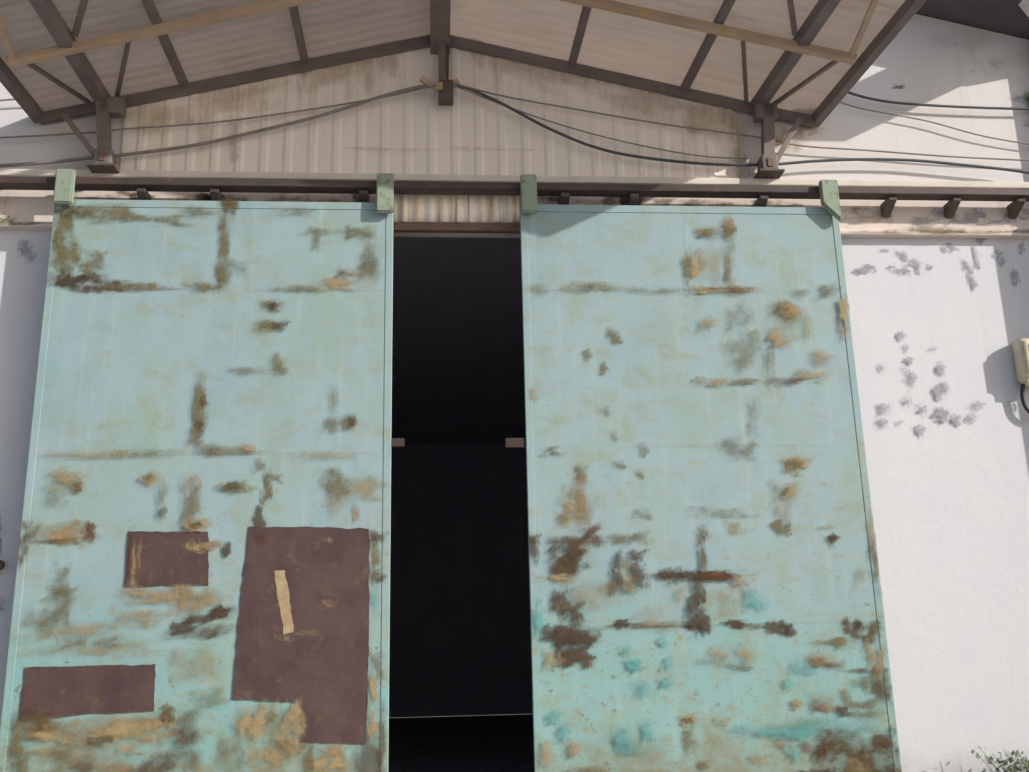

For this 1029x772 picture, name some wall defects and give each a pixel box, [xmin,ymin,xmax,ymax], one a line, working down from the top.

corrosion [51,191,182,292]
corrosion [196,193,247,291]
peeling [855,249,933,275]
peeling [941,238,986,291]
peeling [992,250,1020,285]
peeling [905,362,986,437]
corrosion [125,533,221,636]
corrosion [529,525,601,668]
corrosion [657,530,797,636]
corrosion [235,654,386,772]
corrosion [792,619,890,717]
corrosion [801,728,902,772]